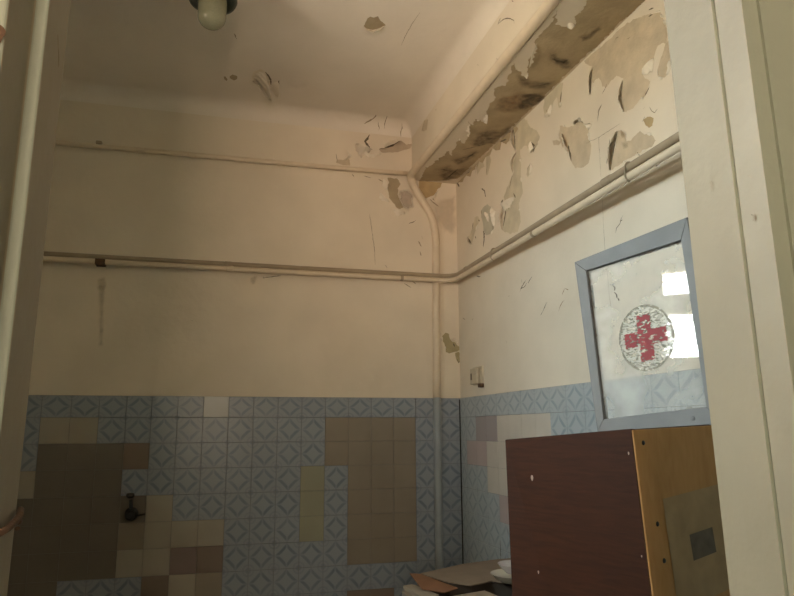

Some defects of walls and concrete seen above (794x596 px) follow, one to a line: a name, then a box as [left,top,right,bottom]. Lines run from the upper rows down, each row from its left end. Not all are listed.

spalling [364,16,385,33]
peeling [419,0,671,246]
peeling [336,127,412,176]
peeling [365,176,405,217]
peeling [441,333,460,363]